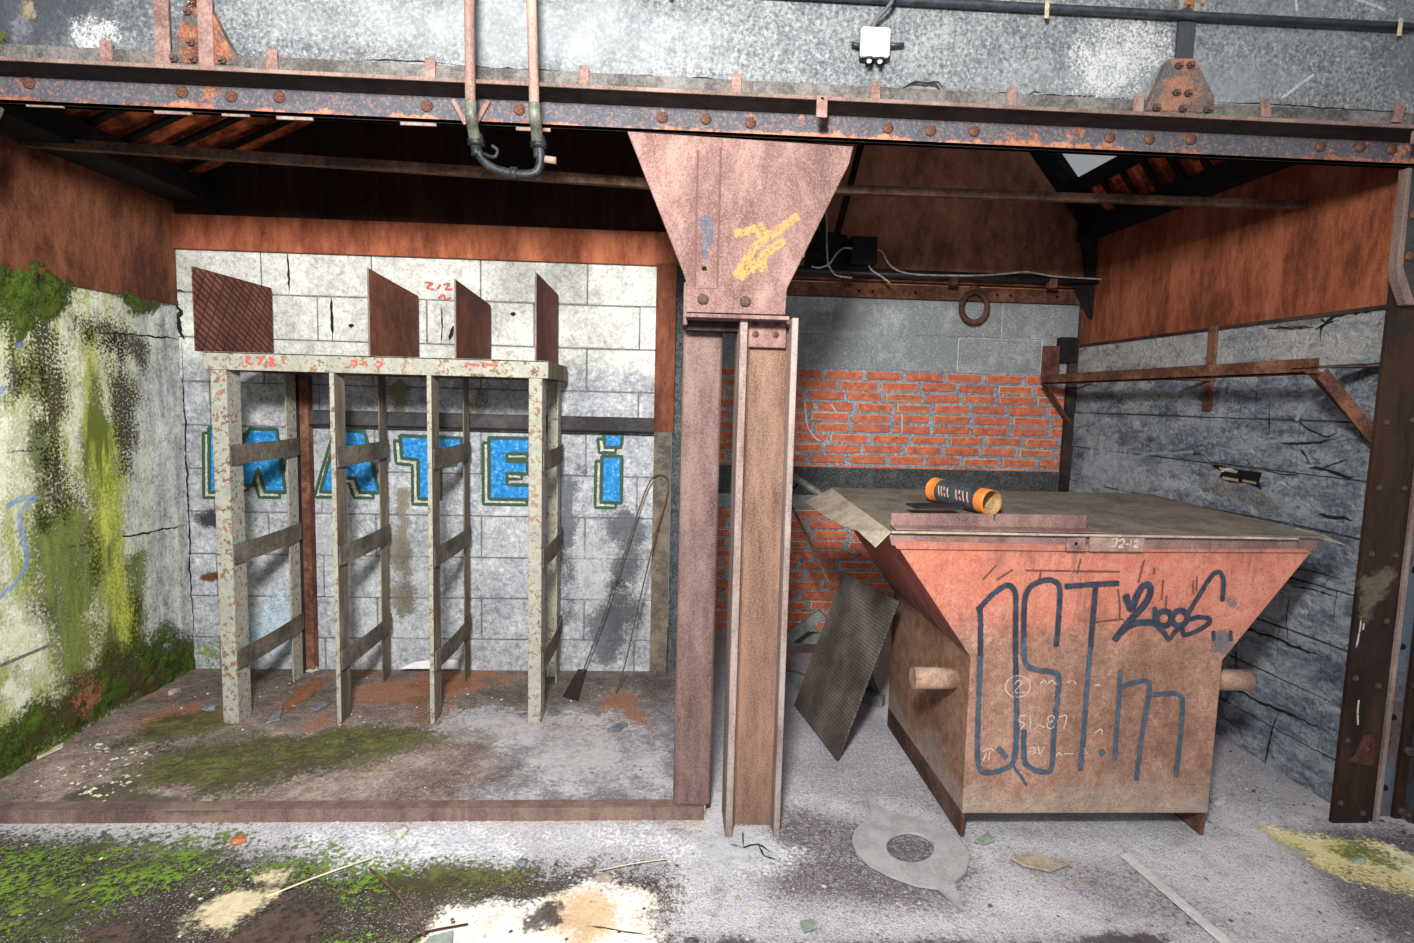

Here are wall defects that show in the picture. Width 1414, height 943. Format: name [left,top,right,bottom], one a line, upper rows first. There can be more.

crack [1269,311,1371,340]
damp [0,306,152,527]
crack [1262,399,1355,479]
crack [1319,513,1352,521]